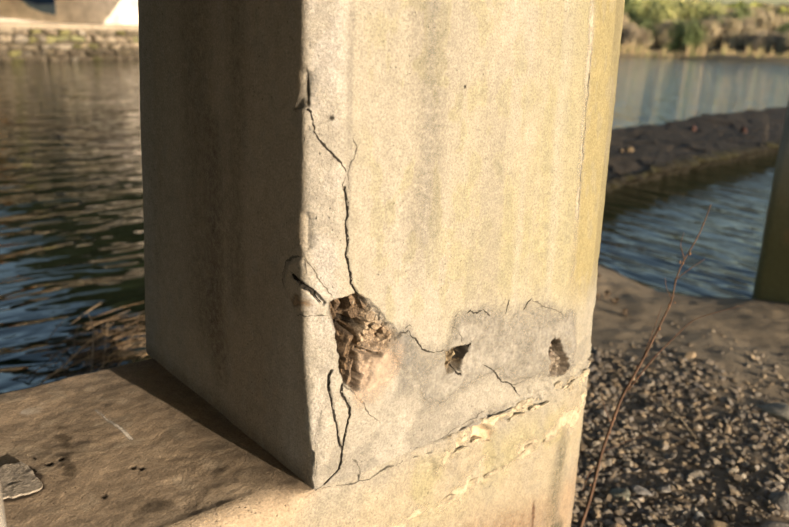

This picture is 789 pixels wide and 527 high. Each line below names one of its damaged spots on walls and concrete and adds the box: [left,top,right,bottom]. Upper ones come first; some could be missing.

crack [307,108,358,293]
spalling [282,255,401,401]
crack [315,371,485,491]
crack [397,324,444,353]
crack [482,364,527,395]
crack [452,298,568,342]
peeling [437,338,591,514]